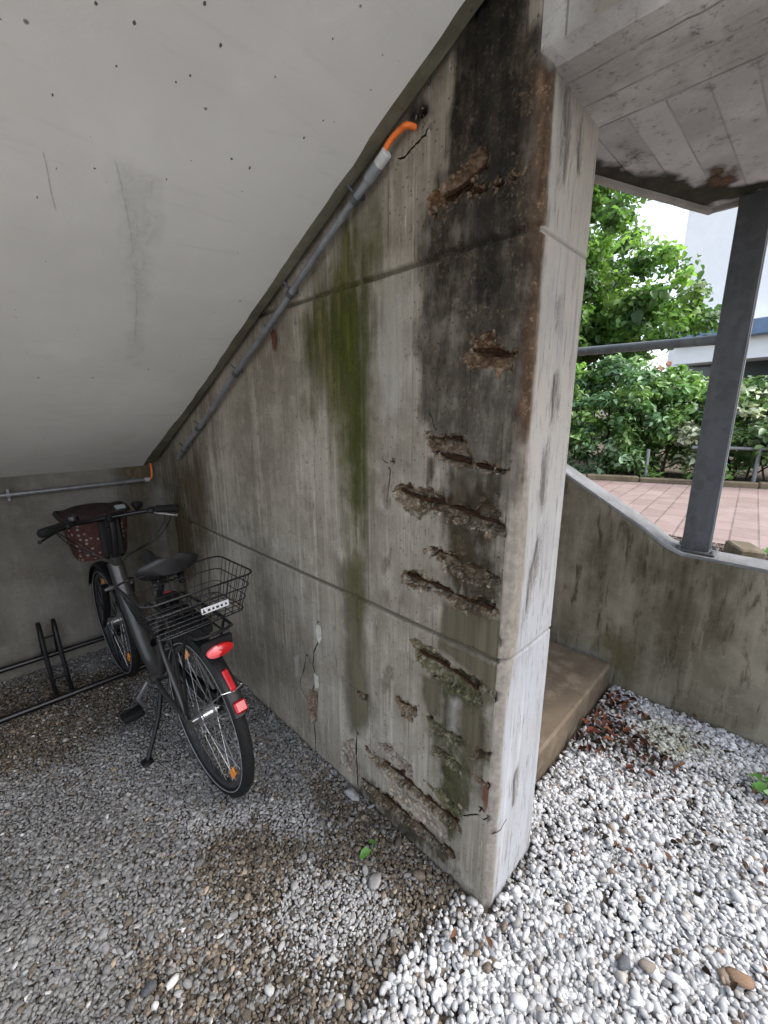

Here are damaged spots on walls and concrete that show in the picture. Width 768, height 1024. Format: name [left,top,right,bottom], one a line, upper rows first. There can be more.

crack [398,126,432,165]
leakage [409,102,428,126]
leakage [418,0,583,509]
spalling [424,429,511,475]
spalling [384,481,507,539]
spalling [401,546,501,618]
leakage [448,519,489,569]
leakage [527,539,540,614]
crack [299,622,322,755]
spalling [409,638,493,708]
spalling [381,667,492,790]
spalling [340,739,463,861]